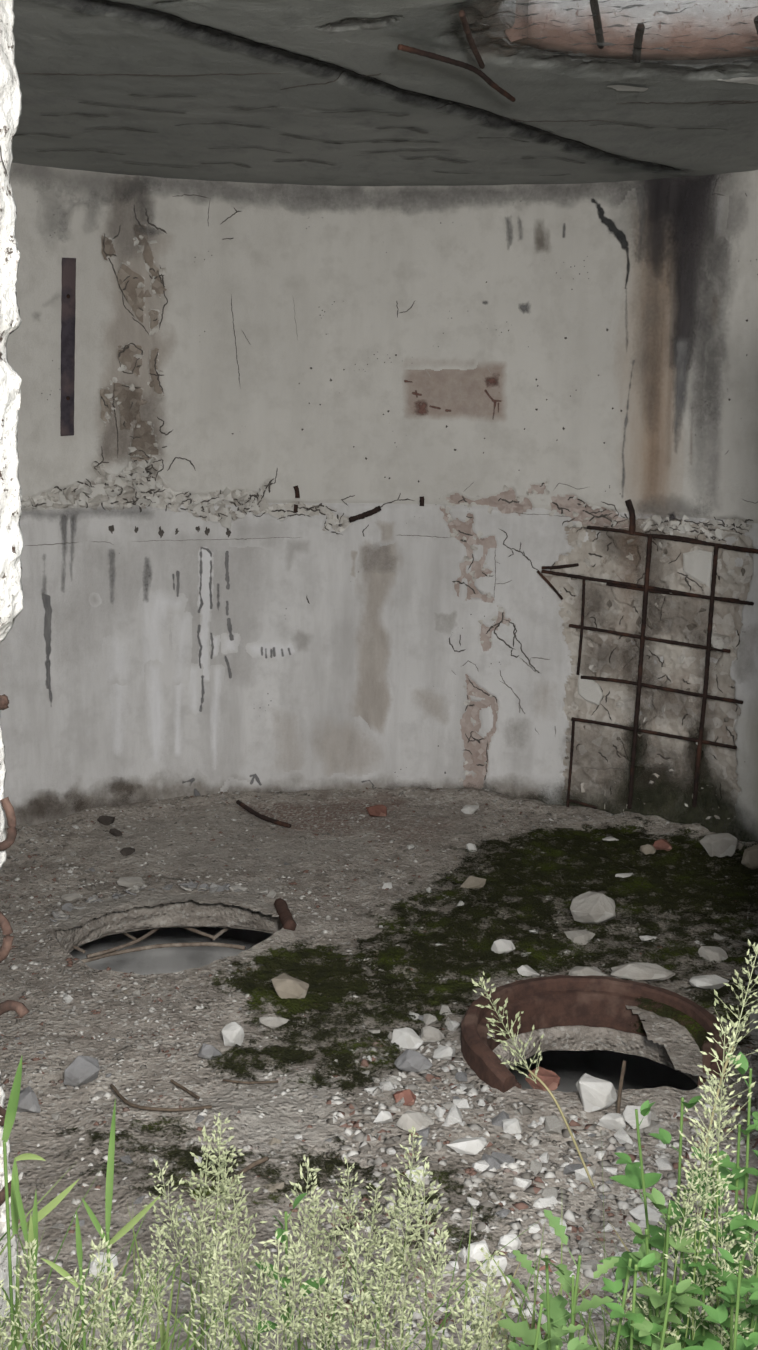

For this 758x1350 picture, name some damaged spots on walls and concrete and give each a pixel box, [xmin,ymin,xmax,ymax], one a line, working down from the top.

crack [18,73,381,90]
peeling [21,224,381,712]
damp [4,510,565,828]
damp [86,172,752,517]
spalling [440,481,754,819]
crack [449,483,758,780]
damp [9,620,758,1350]